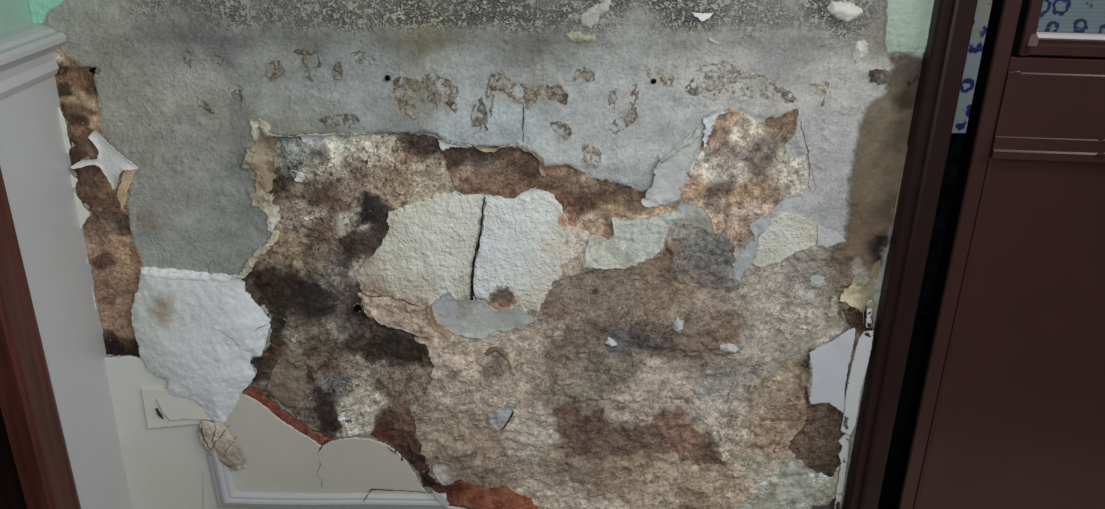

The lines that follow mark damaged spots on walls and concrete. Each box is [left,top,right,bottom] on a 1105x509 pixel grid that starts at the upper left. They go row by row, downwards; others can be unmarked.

flaking render [55,45,874,509]
crack [470,197,485,300]
leakage [832,54,923,271]